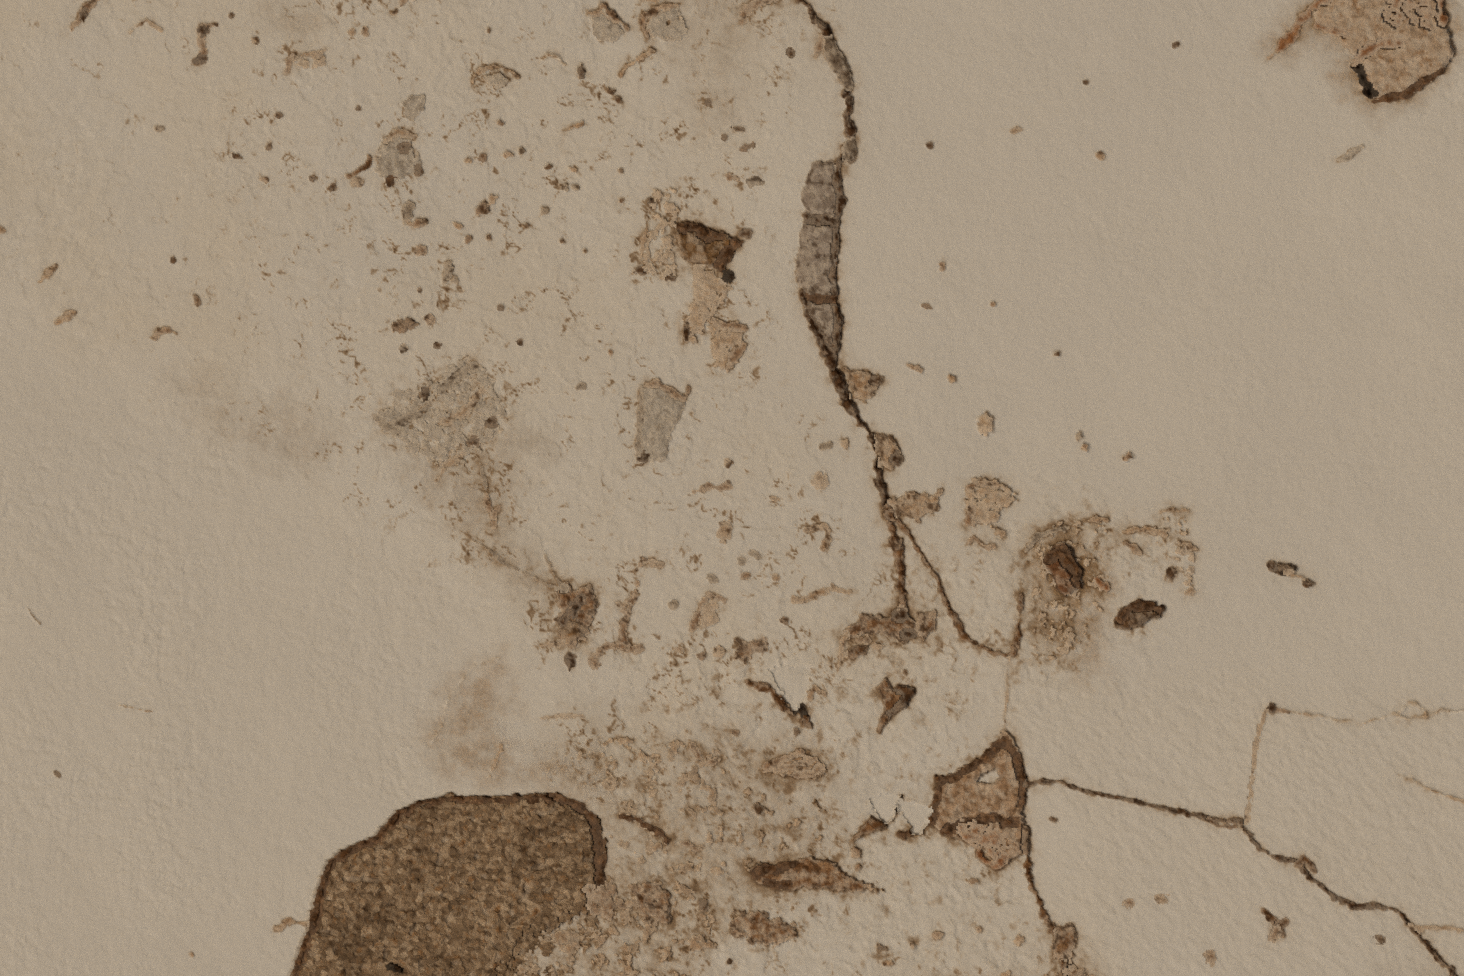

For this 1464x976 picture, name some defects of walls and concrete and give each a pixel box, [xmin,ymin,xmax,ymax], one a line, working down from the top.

flaking render [1267,0,1454,104]
peeling [372,356,506,530]
peeling [634,378,691,465]
flaking render [633,188,752,372]
crack [739,0,1024,733]
flaking render [469,536,602,672]
flaking render [1024,508,1198,660]
flaking render [274,637,1030,976]
crack [1021,703,1464,976]